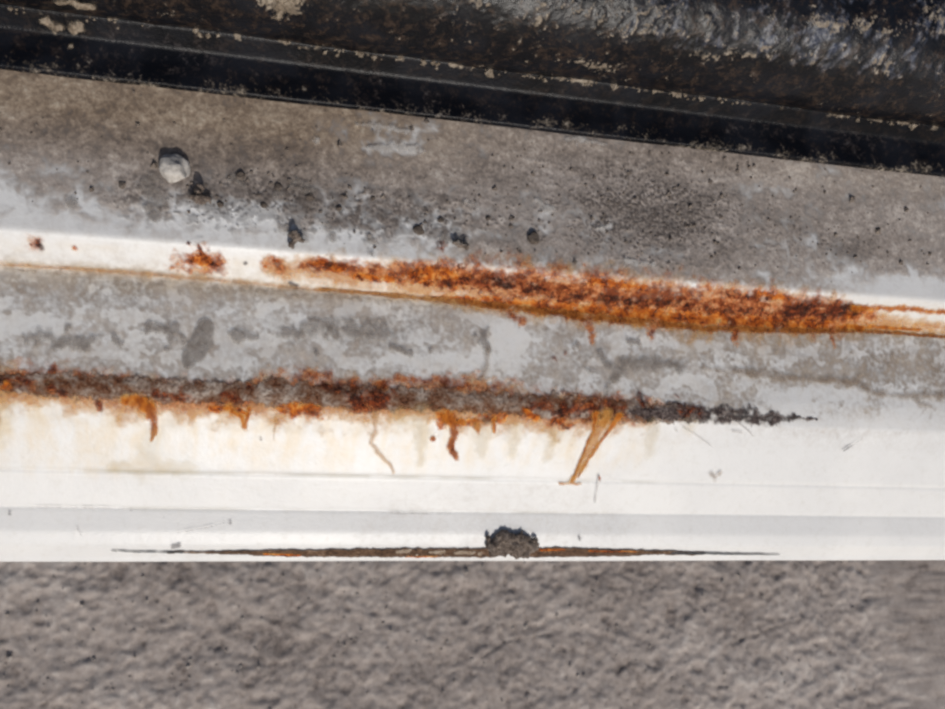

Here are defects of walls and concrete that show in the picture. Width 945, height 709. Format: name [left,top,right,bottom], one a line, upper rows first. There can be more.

corrosion [169,242,226,279]
corrosion [262,241,945,348]
corrosion [0,367,33,389]
corrosion [47,365,129,397]
corrosion [121,374,263,442]
corrosion [276,402,323,420]
corrosion [278,368,515,414]
corrosion [427,409,508,460]
corrosion [523,391,662,485]